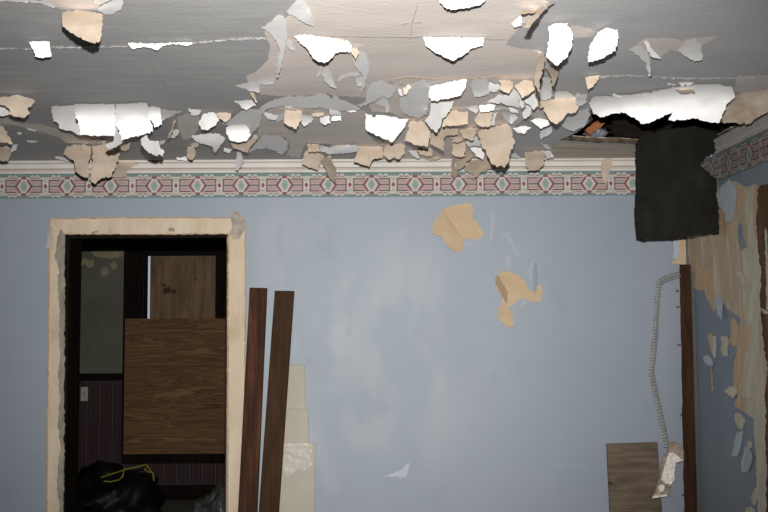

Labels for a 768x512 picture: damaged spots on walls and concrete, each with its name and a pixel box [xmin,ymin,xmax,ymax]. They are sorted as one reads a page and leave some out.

peeling [0,0,768,184]
peeling [432,203,484,253]
peeling [495,263,543,327]
spalling [707,183,768,512]